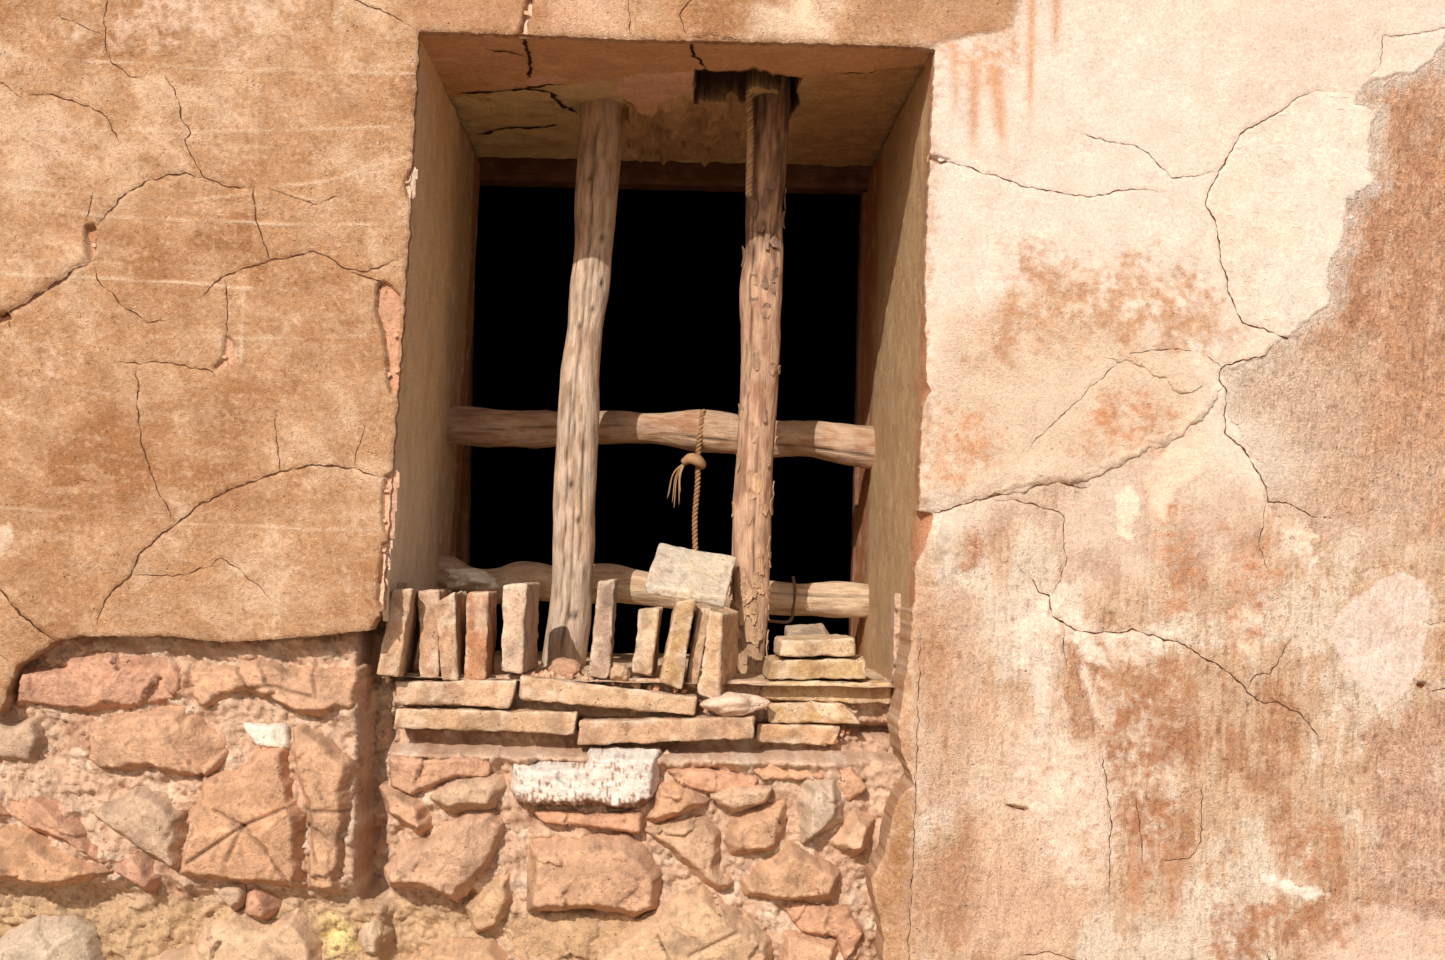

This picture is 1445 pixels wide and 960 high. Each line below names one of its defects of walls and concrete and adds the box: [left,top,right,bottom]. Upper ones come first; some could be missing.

crack [0,82,118,139]
crack [1,262,165,327]
crack [58,0,403,333]
crack [461,1,577,135]
crack [679,0,735,67]
crack [943,89,1335,567]
crack [0,589,54,640]
crack [96,361,384,631]
crack [929,483,1319,739]
peeling [1221,46,1445,920]
crack [907,637,921,960]
crack [1100,746,1203,889]